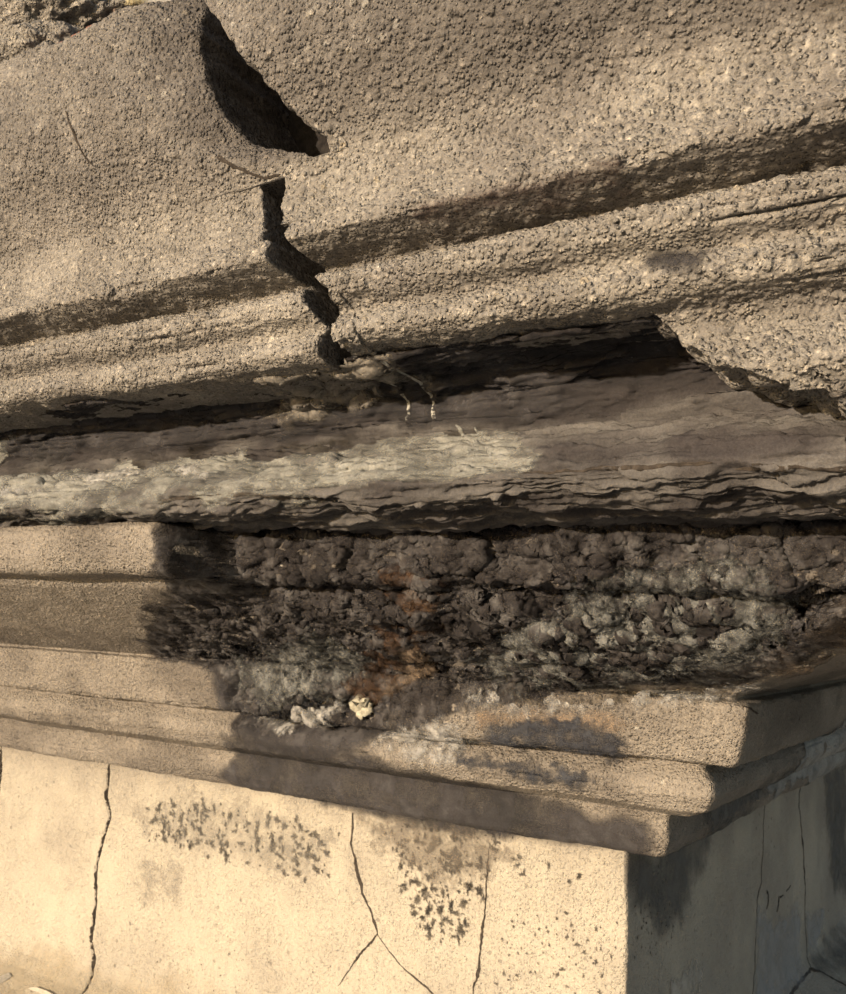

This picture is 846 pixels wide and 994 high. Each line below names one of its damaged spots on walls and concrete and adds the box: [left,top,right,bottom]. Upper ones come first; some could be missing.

crack [216,155,281,180]
spalling [136,519,846,736]
crack [0,746,8,783]
water stain [379,723,471,765]
crack [82,765,111,994]
water stain [144,798,330,883]
crack [338,813,434,994]
water stain [372,822,525,945]
crack [473,851,489,994]
water stain [534,911,616,965]
water stain [624,769,793,958]
crack [752,788,846,994]